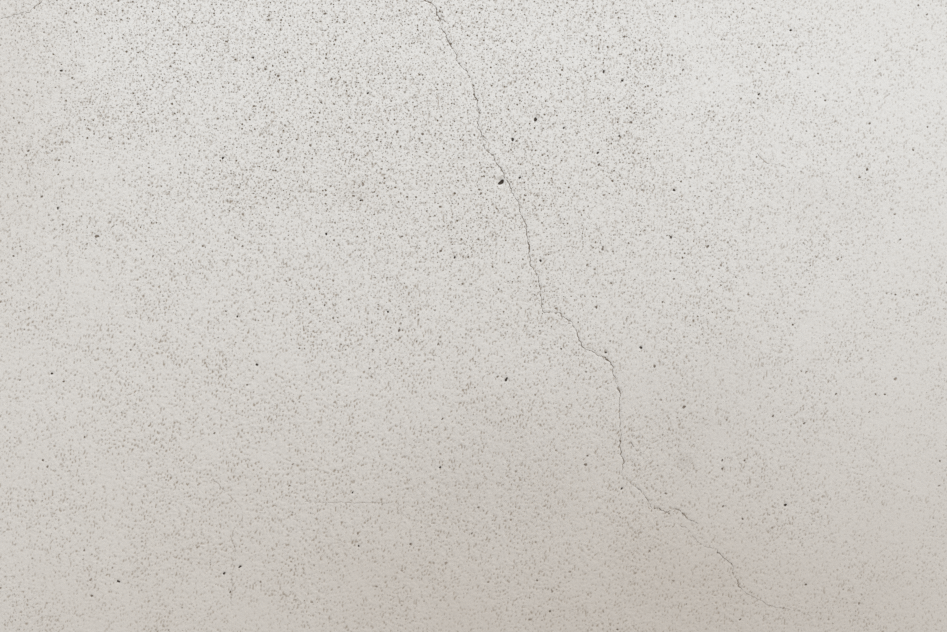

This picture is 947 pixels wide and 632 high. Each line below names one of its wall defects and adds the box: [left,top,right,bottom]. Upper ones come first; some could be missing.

crack [425,0,809,615]